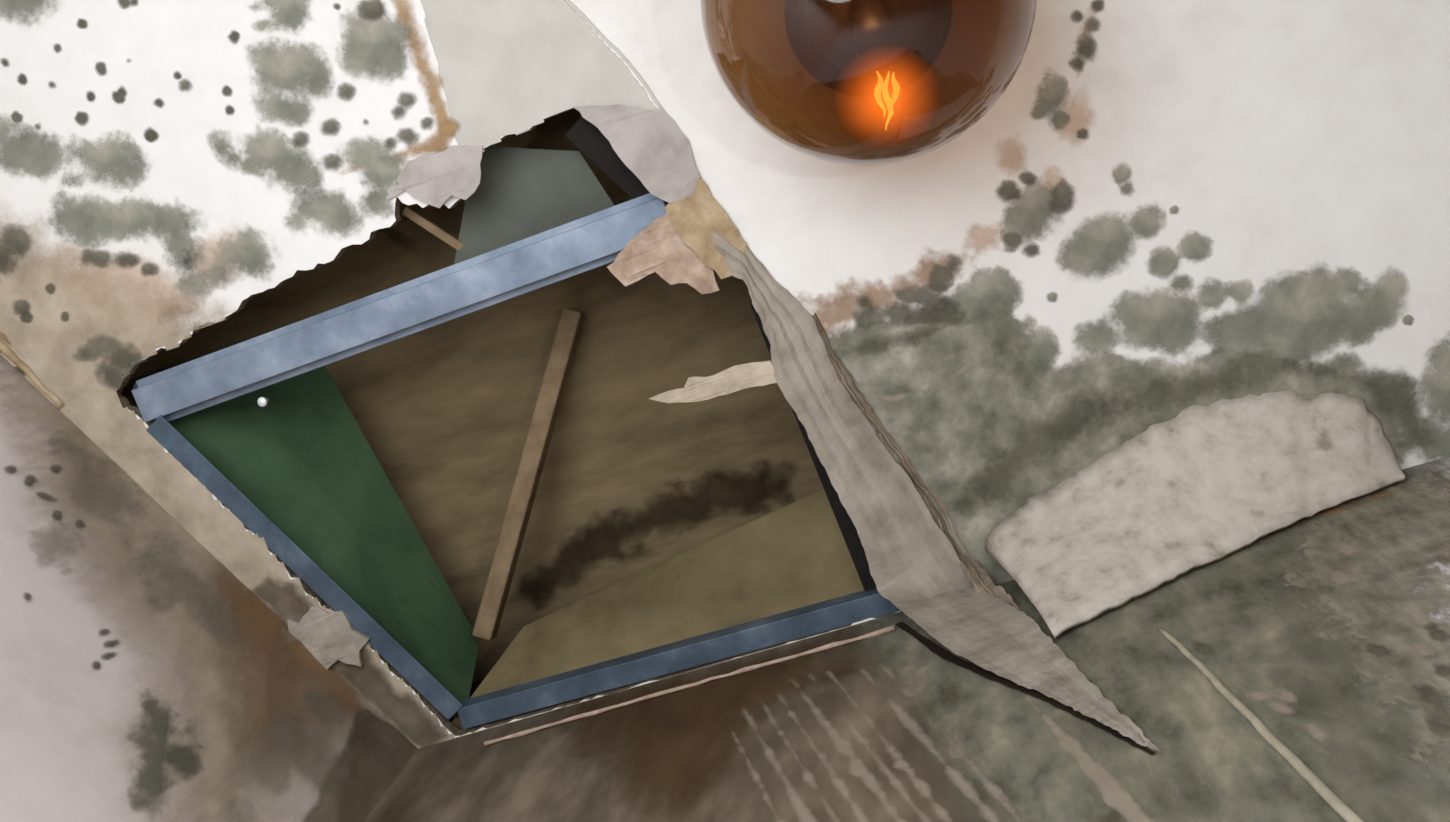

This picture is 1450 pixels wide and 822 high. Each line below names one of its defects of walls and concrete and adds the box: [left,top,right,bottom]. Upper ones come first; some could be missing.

mould [0,0,48,21]
mould [119,0,137,8]
mould [2,59,27,84]
mould [75,92,95,124]
mould [113,88,126,103]
mould [174,72,190,90]
damp [210,0,458,234]
mould [1032,0,1103,139]
damp [0,112,269,295]
mould [998,173,1073,256]
mould [1060,206,1178,276]
damp [0,227,1450,822]